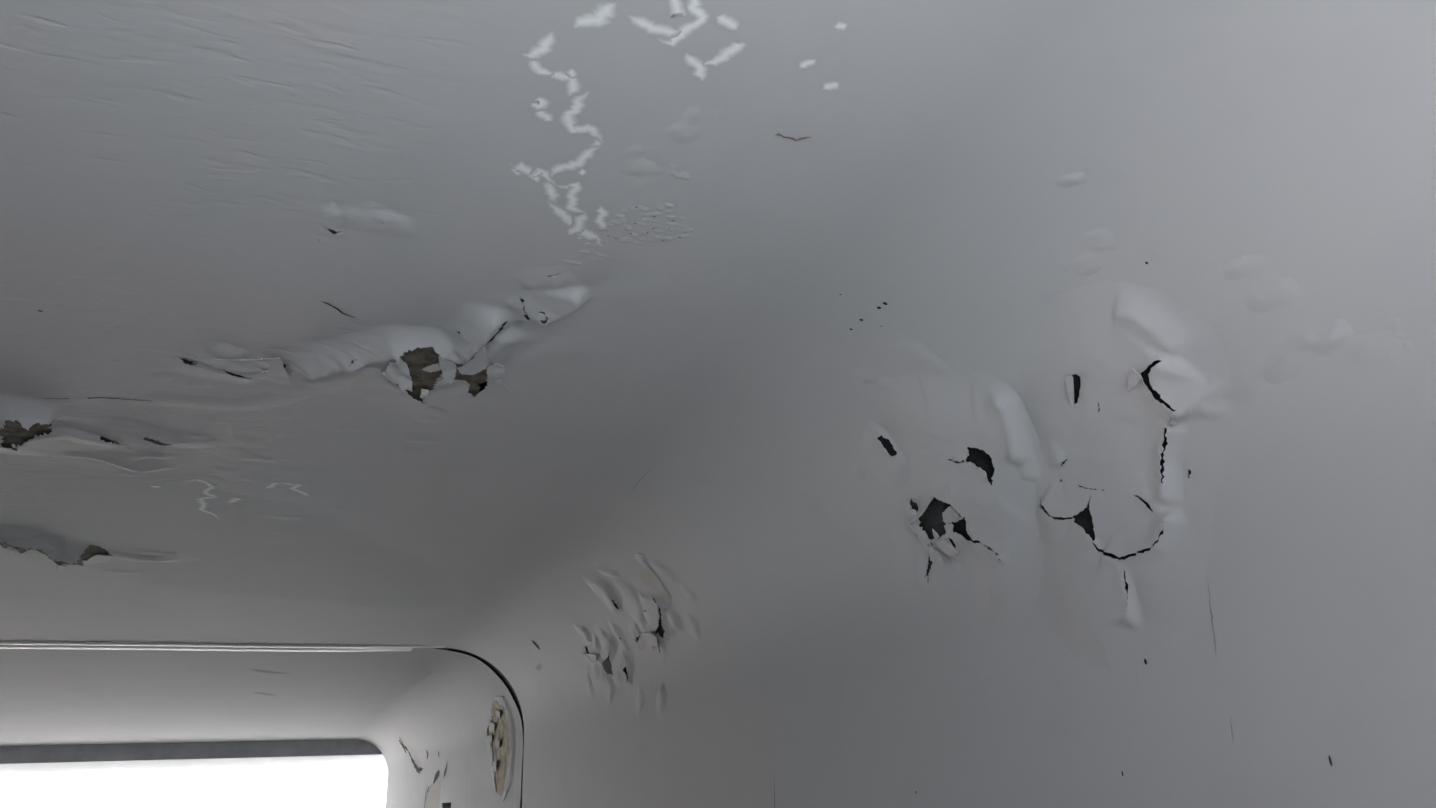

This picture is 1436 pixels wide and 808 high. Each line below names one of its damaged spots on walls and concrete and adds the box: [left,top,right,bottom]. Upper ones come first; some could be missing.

peeling [0,266,673,480]
peeling [0,527,200,575]
peeling [827,281,1240,706]
peeling [568,553,701,725]
spalling [484,696,516,802]